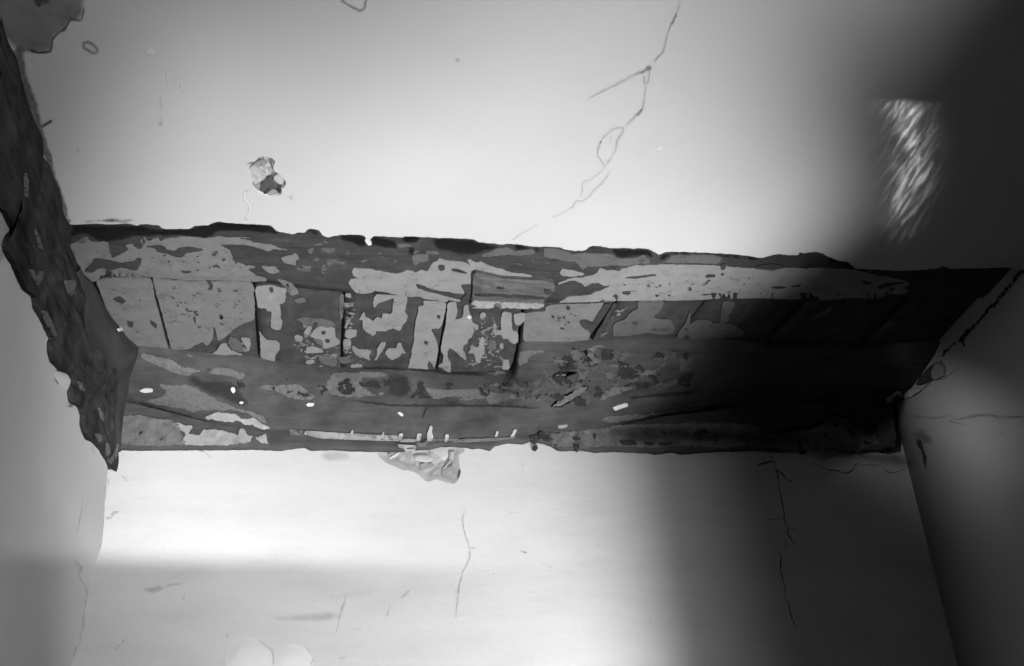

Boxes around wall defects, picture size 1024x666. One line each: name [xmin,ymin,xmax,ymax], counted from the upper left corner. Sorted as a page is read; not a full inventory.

peeling [0,0,910,424]
spalling [377,447,465,484]
spalling [531,430,554,451]
crack [758,461,795,625]